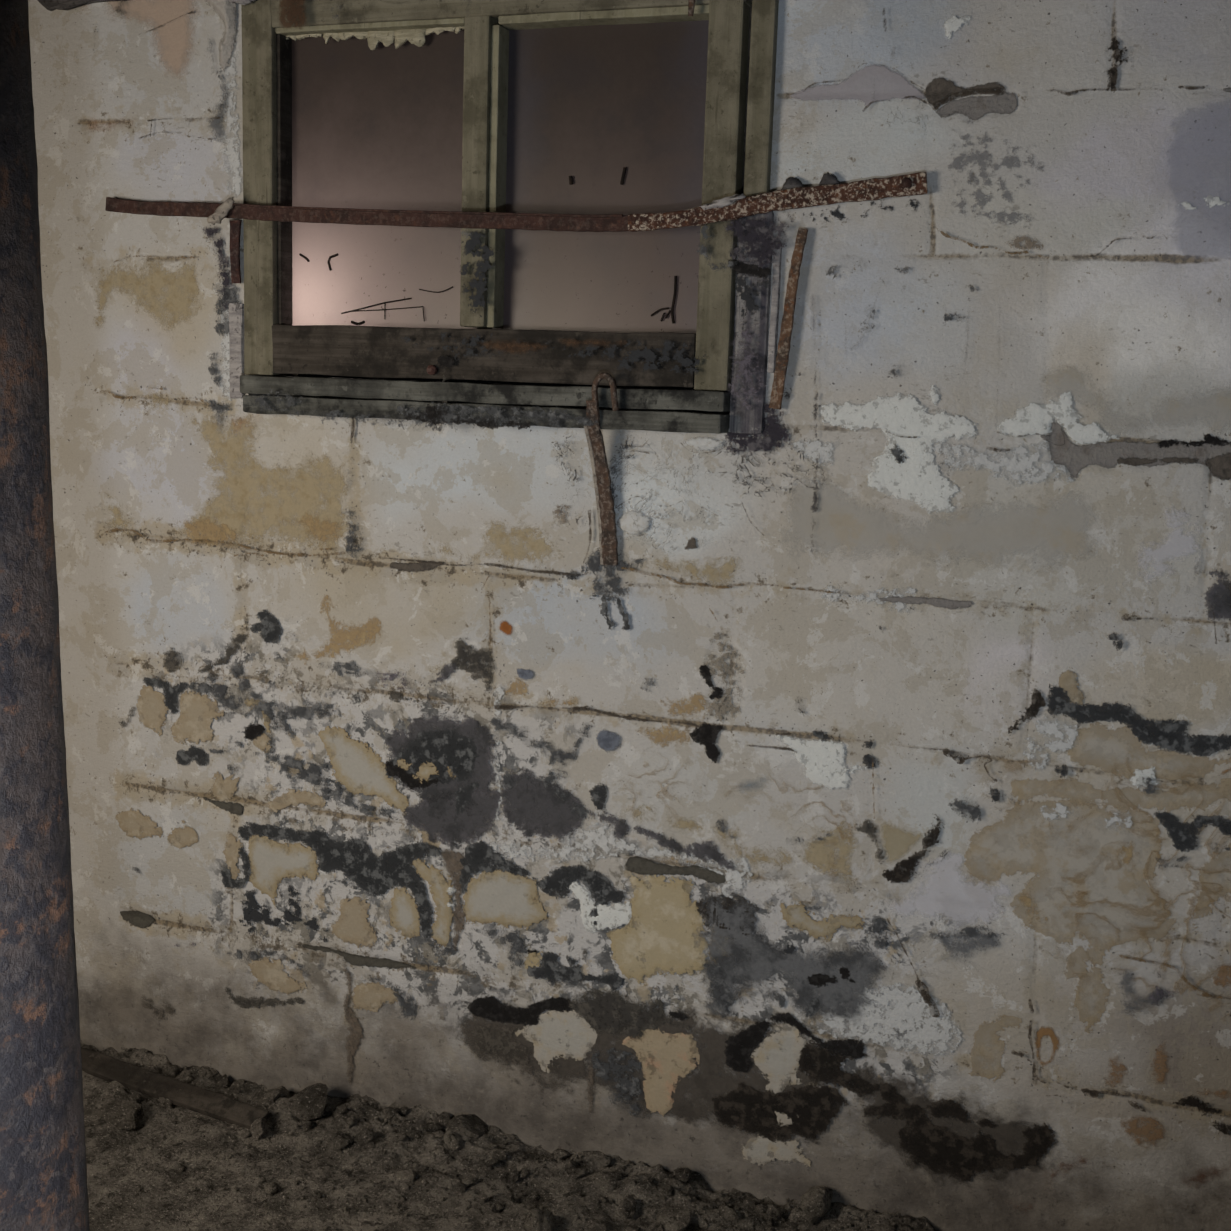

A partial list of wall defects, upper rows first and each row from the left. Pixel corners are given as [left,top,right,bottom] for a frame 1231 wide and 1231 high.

spalling [790,65,1017,120]
rust [105,172,928,232]
peeling [949,133,1043,250]
rust [769,228,808,410]
peeling [819,385,1231,514]
crack [105,528,345,557]
crack [389,558,588,639]
crack [621,567,834,614]
leakage [1109,633,1123,651]
leakage [142,595,1055,1184]
leakage [795,684,1231,1033]
leakage [1172,1095,1231,1135]